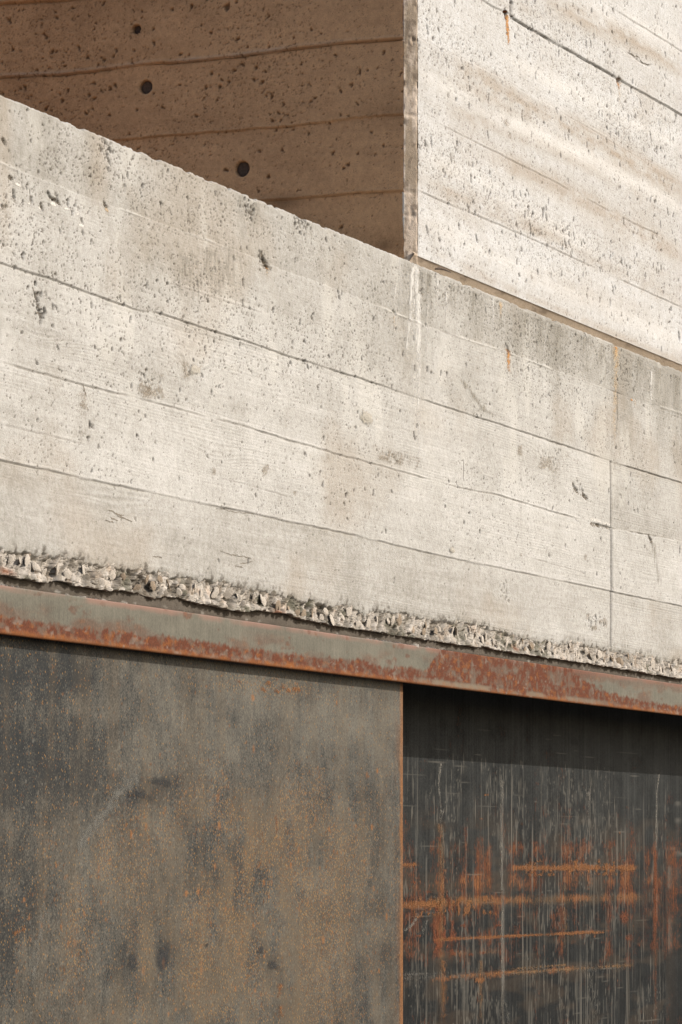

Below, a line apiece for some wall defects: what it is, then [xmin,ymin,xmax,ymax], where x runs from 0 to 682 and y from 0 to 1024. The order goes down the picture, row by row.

spalling [0,549,682,679]
corrosion [517,859,634,876]
corrosion [403,893,631,1018]